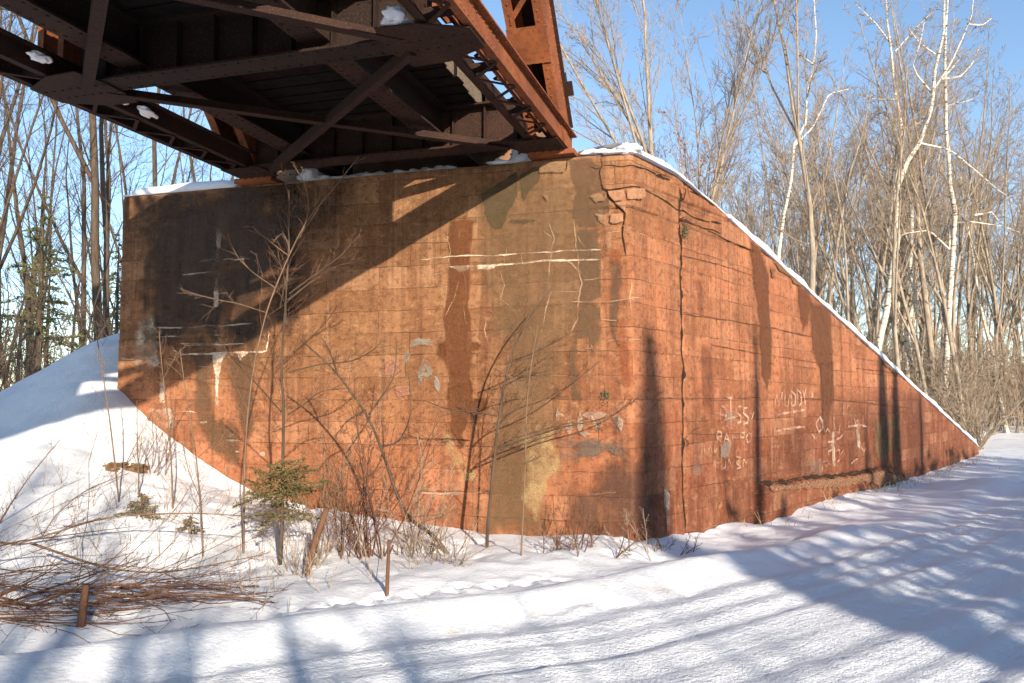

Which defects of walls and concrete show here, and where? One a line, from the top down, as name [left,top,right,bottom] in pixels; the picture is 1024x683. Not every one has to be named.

spalling [539,161,565,173]
spalling [590,188,646,225]
water stain [444,157,620,399]
crack [592,161,817,527]
crack [802,398,912,409]
spalling [770,470,909,492]